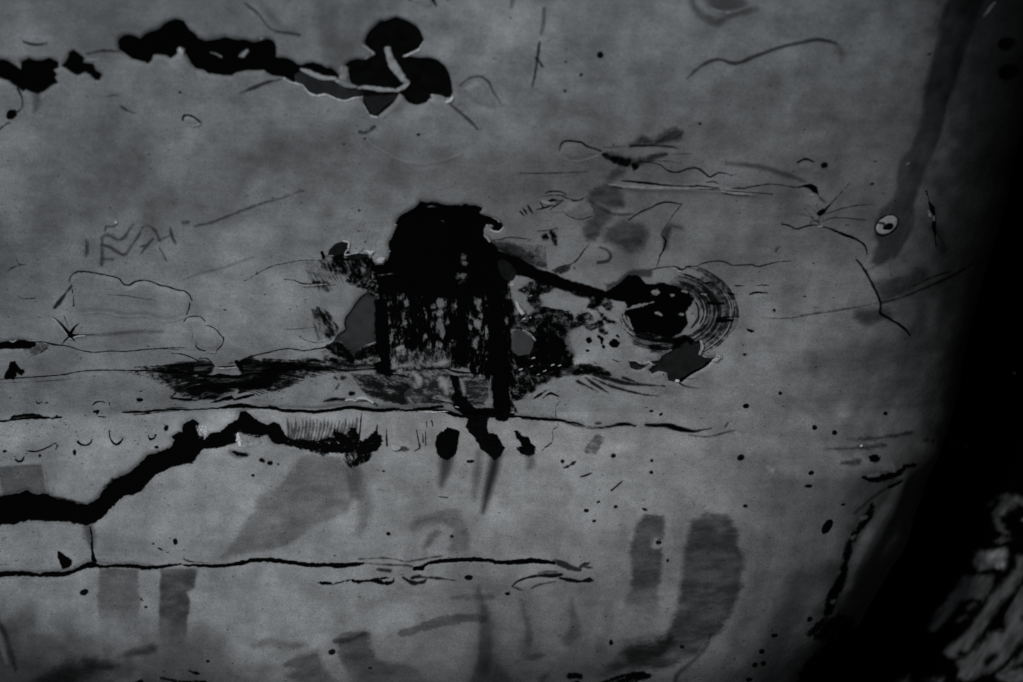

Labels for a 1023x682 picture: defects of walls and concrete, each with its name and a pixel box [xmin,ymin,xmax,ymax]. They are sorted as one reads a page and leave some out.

spalling [0,50,102,94]
spalling [118,17,454,118]
spalling [320,240,391,265]
crack [609,161,910,336]
crack [0,327,335,422]
spalling [334,293,376,355]
spalling [511,301,561,375]
spalling [629,338,722,386]
crack [92,398,466,418]
crack [510,404,727,450]
crack [0,527,593,589]
leakage [614,520,739,669]